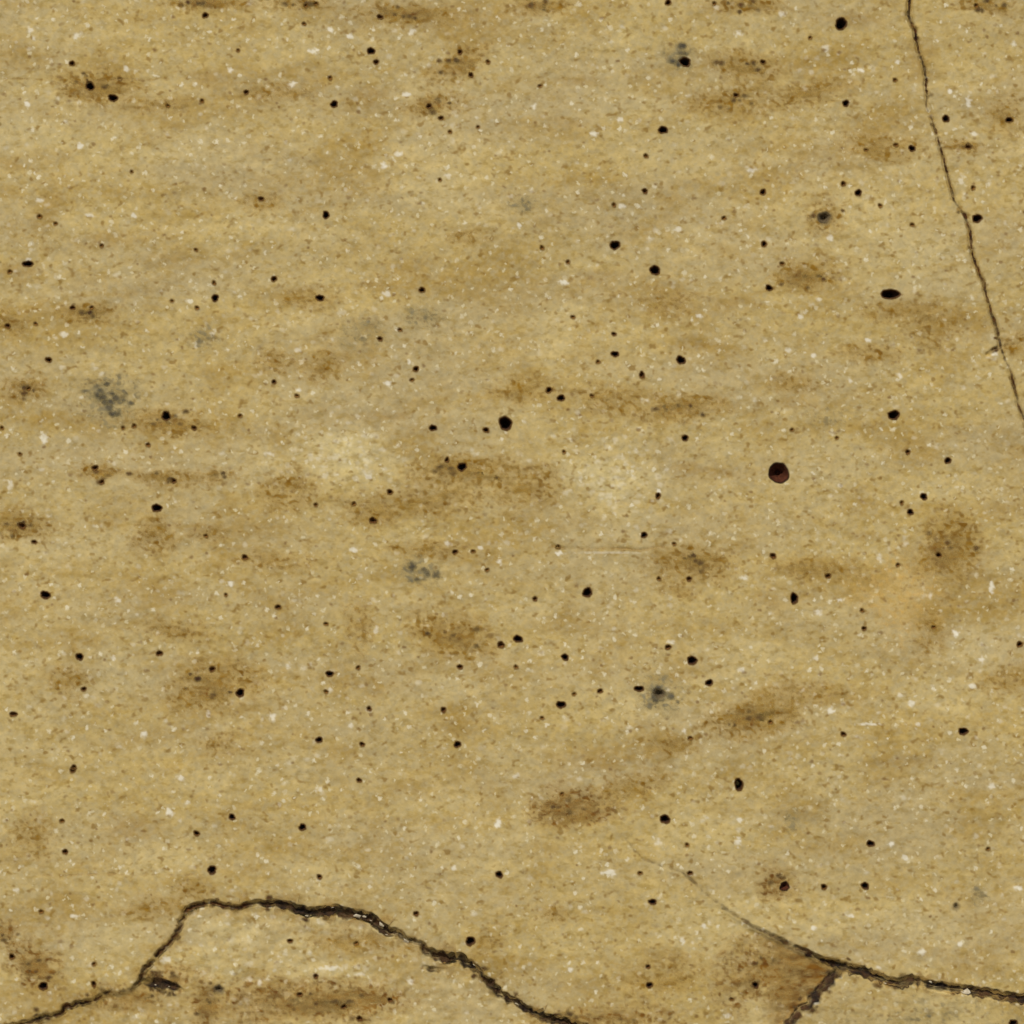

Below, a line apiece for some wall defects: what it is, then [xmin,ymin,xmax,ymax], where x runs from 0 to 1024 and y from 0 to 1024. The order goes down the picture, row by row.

crack [907,0,1024,420]
crack [12,989,108,1024]
crack [134,895,577,1024]
crack [745,922,1024,1024]